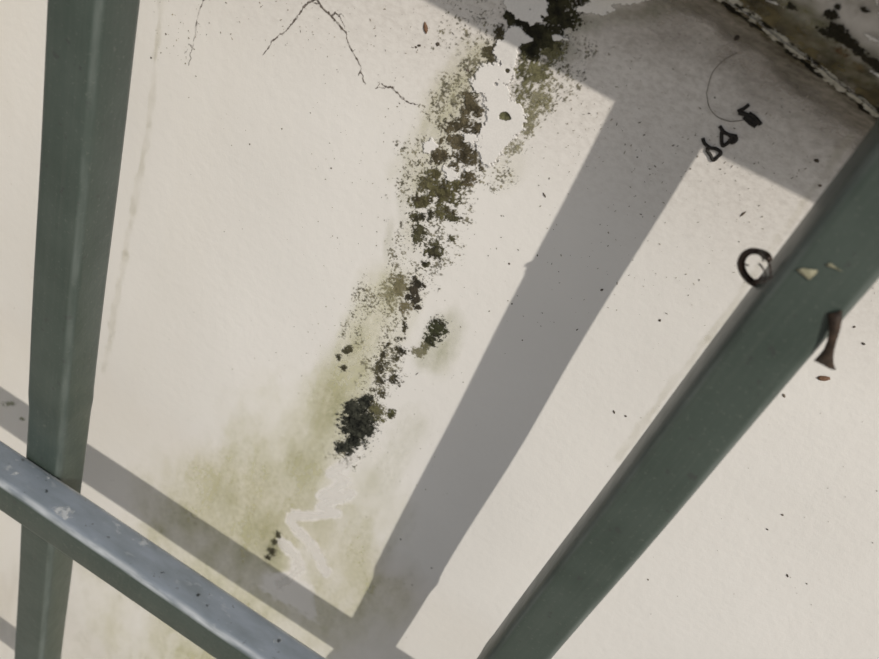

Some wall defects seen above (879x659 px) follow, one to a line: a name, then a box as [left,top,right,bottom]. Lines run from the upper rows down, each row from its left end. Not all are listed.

crack [264,0,418,105]
water stain [667,0,879,145]
peeling [717,0,879,117]
water stain [335,0,597,414]
water stain [264,530,281,560]